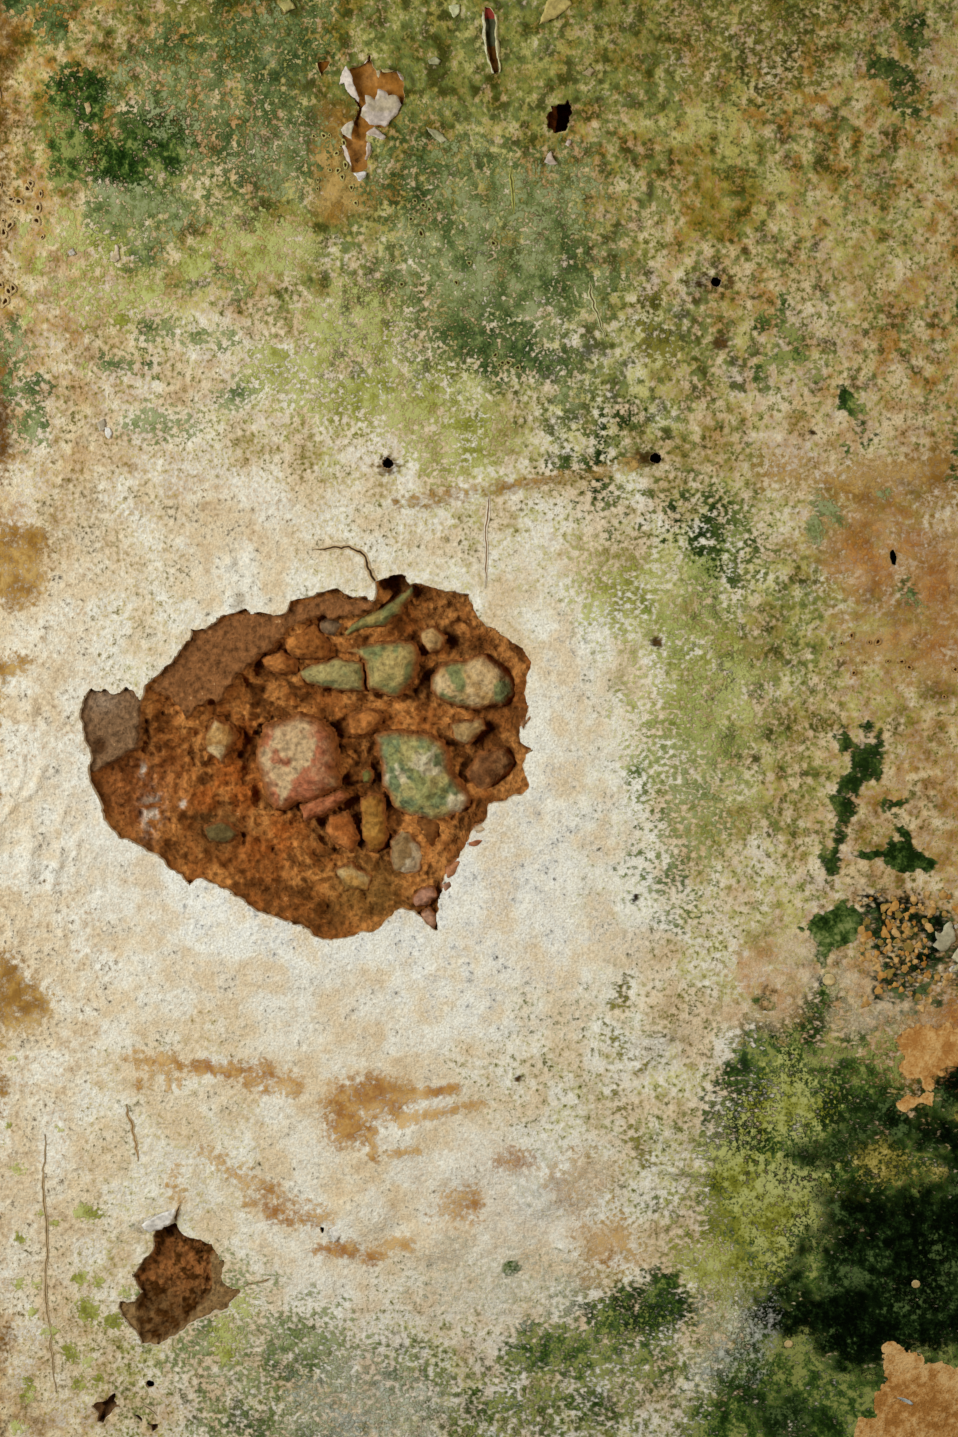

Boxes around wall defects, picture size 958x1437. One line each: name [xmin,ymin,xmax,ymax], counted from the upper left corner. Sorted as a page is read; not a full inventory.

peeling [539,0,572,24]
peeling [312,55,405,207]
damp [0,355,12,470]
spalling [828,632,913,676]
spalling [79,574,533,941]
peeling [718,933,812,1022]
peeling [924,921,958,972]
peeling [834,968,958,1112]
spalling [118,1204,270,1346]
peeling [854,1341,958,1437]